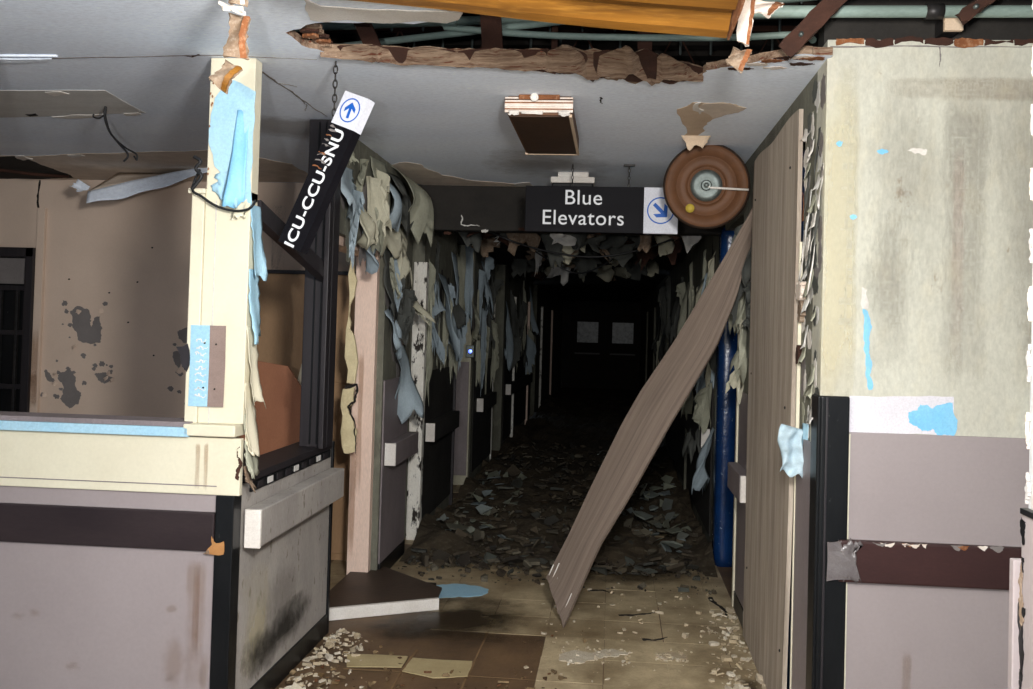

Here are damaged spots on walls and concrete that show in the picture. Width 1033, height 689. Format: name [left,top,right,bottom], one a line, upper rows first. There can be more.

peeling [300,0,463,48]
peeling [392,162,533,187]
peeling [677,102,746,151]
peeling [0,80,308,479]
spalling [340,170,375,454]
peeling [384,279,403,378]
peeling [440,244,455,342]
peeling [466,256,492,358]
leakage [252,604,303,664]